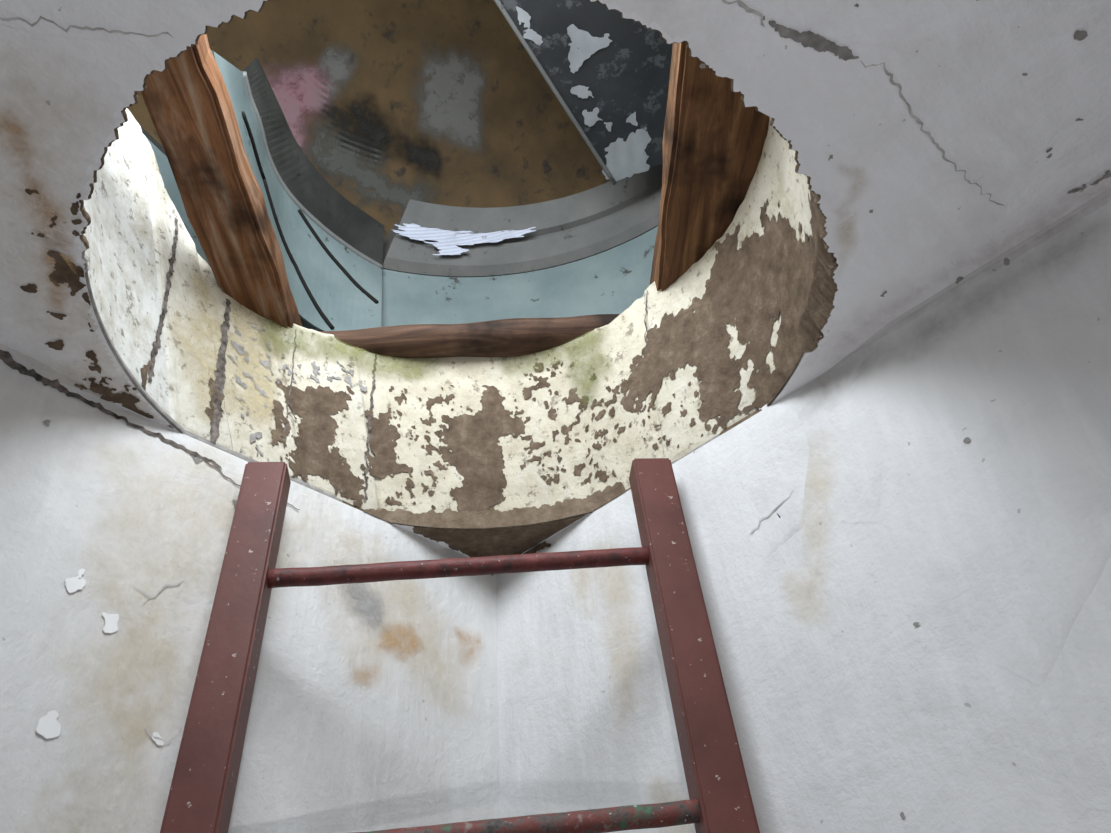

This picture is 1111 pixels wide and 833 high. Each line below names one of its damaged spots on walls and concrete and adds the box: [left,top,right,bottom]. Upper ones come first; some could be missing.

crack [0,16,174,38]
crack [722,0,765,27]
crack [861,61,1005,206]
peeling [70,193,82,237]
peeling [20,283,37,293]
peeling [31,215,94,332]
peeling [44,340,64,350]
peeling [74,350,154,419]
water stain [350,583,381,622]